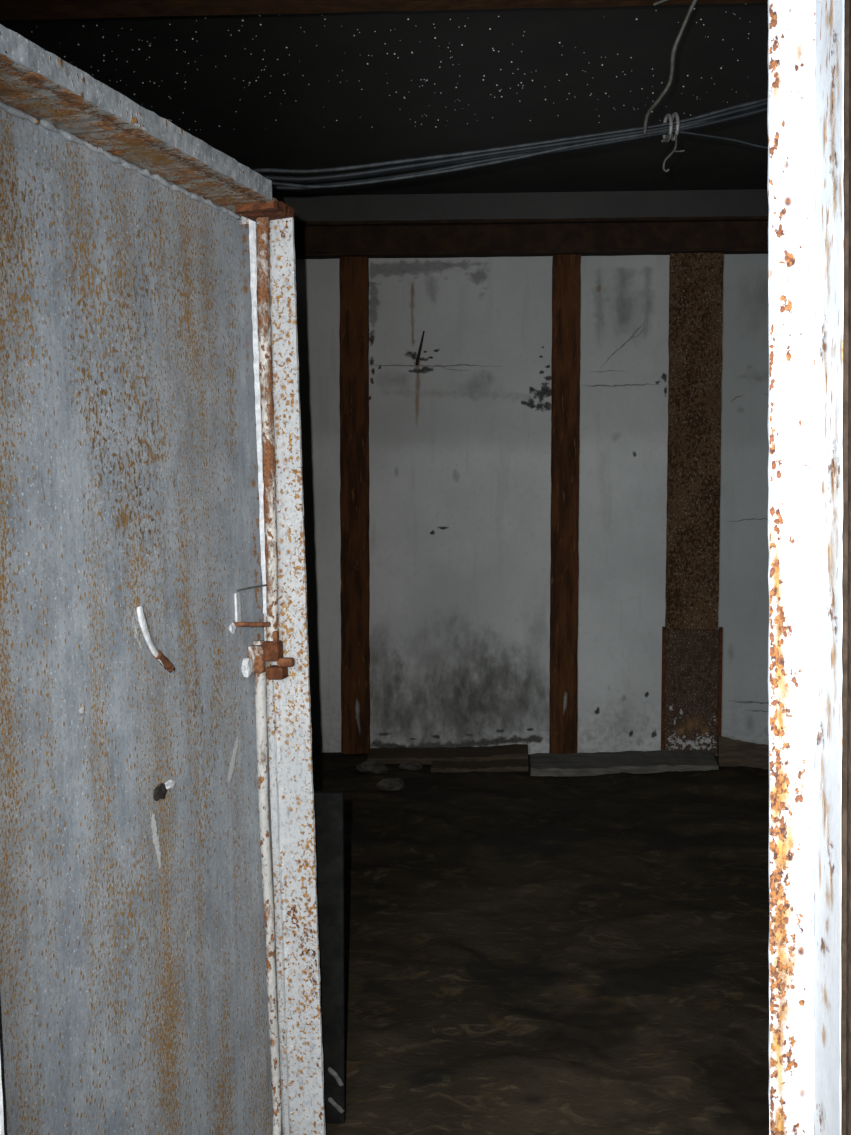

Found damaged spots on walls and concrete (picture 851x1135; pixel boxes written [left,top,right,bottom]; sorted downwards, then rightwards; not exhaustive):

corrosion [769,3,780,93]
corrosion [769,129,789,159]
corrosion [829,133,837,217]
corrosion [773,207,796,267]
corrosion [769,294,792,482]
corrosion [827,552,837,675]
corrosion [278,587,302,751]
corrosion [770,502,805,1135]
corrosion [826,822,834,900]